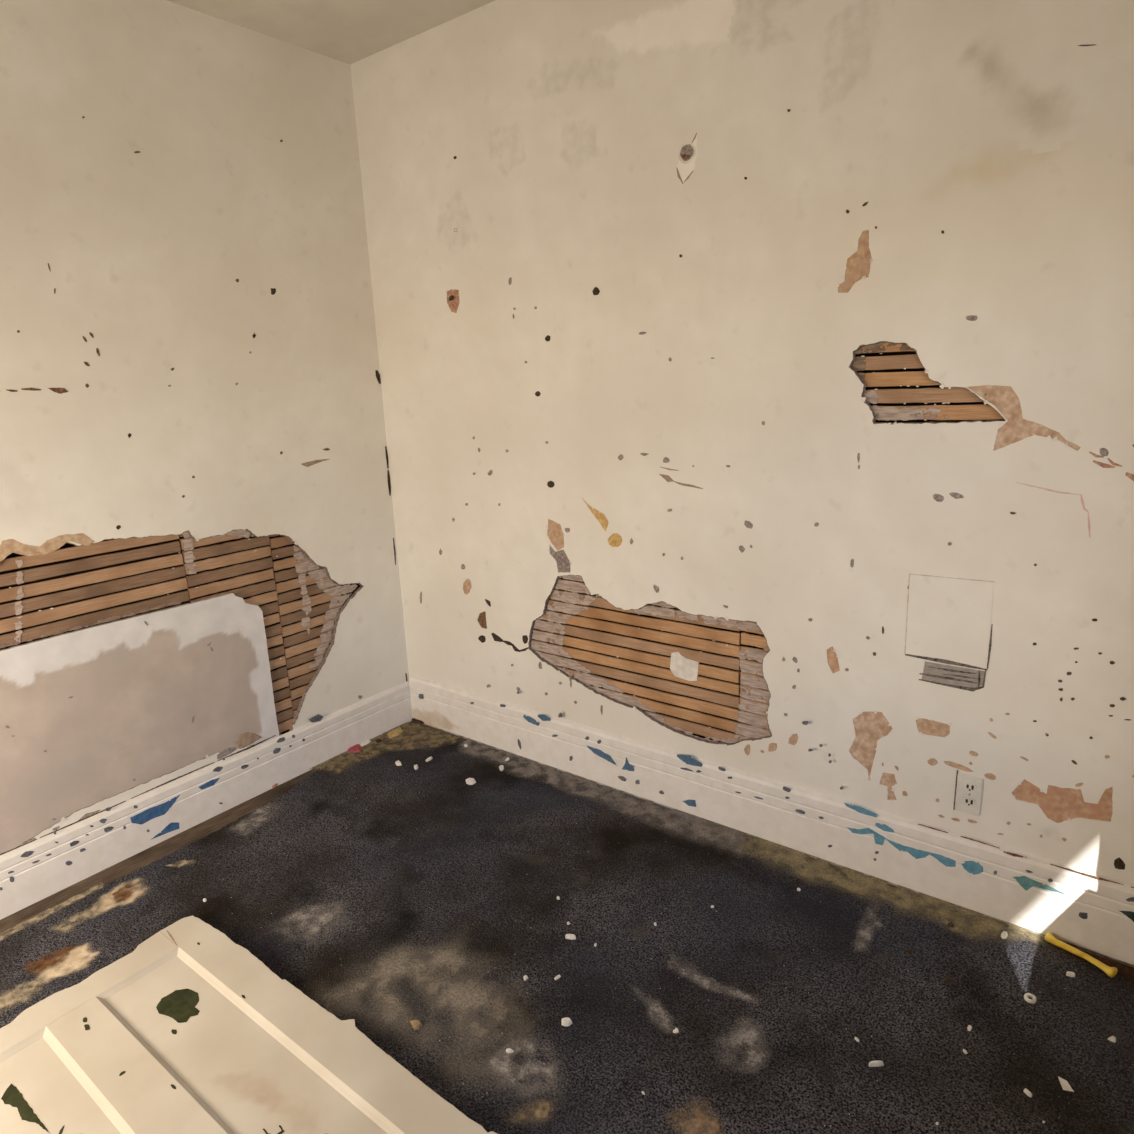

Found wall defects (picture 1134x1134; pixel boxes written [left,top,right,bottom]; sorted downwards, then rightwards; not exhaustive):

spalling [836,226,877,293]
spalling [523,519,832,763]
spalling [0,529,364,865]
peeling [677,754,702,773]
spalling [849,710,908,800]
peeling [840,785,997,875]
peeling [1004,851,1066,895]
spalling [1012,779,1113,823]